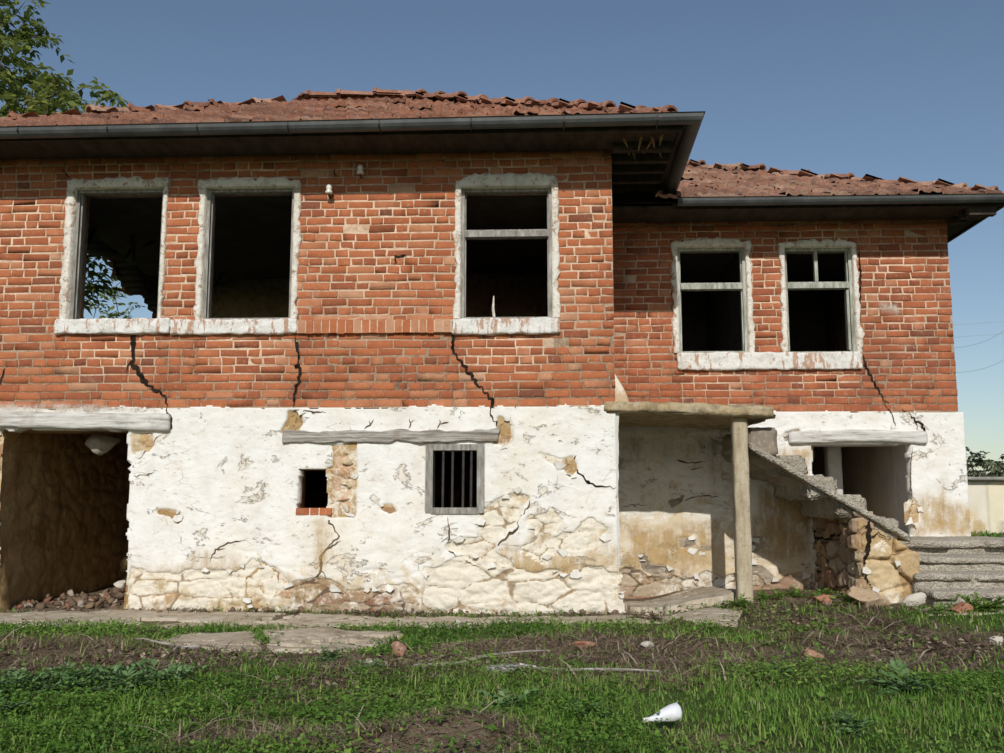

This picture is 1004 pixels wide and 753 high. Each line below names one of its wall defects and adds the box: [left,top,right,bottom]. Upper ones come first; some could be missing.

crack [126,335,172,429]
flaking render [281,410,305,433]
crack [292,337,326,414]
crack [451,332,498,445]
crack [858,250,925,499]
flaking render [326,442,358,518]
crack [574,456,644,508]
crack [210,540,244,560]
crack [315,516,340,579]
flaking render [128,486,736,616]
flaking render [752,537,816,590]